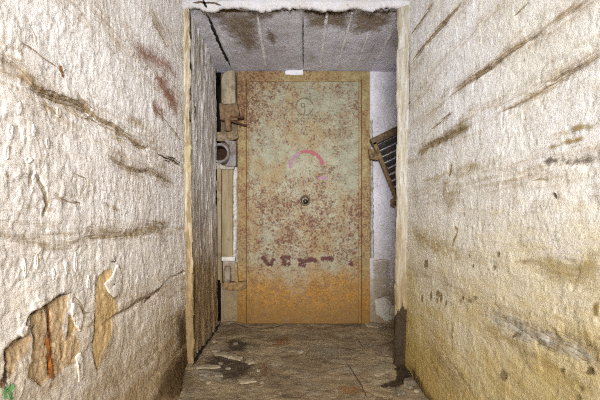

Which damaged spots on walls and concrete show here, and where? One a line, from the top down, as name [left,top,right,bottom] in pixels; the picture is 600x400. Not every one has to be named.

corrosion [136,48,177,111]
crack [192,0,233,67]
spalling [3,257,123,386]
crack [103,268,282,393]